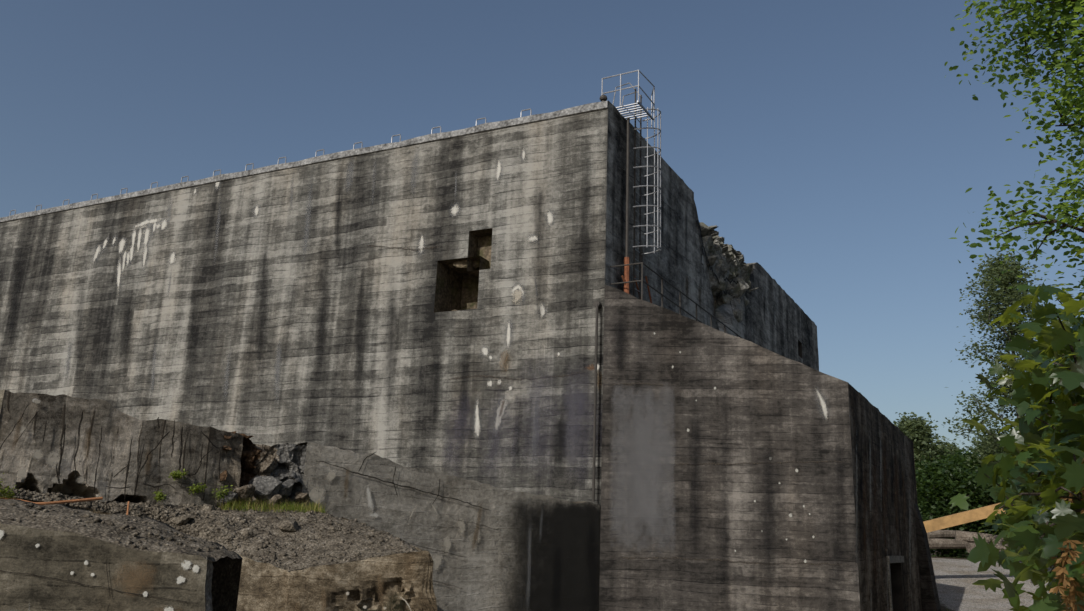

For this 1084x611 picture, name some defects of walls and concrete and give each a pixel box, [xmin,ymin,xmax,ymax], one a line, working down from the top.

damp [94,208,170,287]
damp [529,200,553,257]
damp [123,308,131,365]
damp [462,399,480,436]
damp [487,380,512,429]